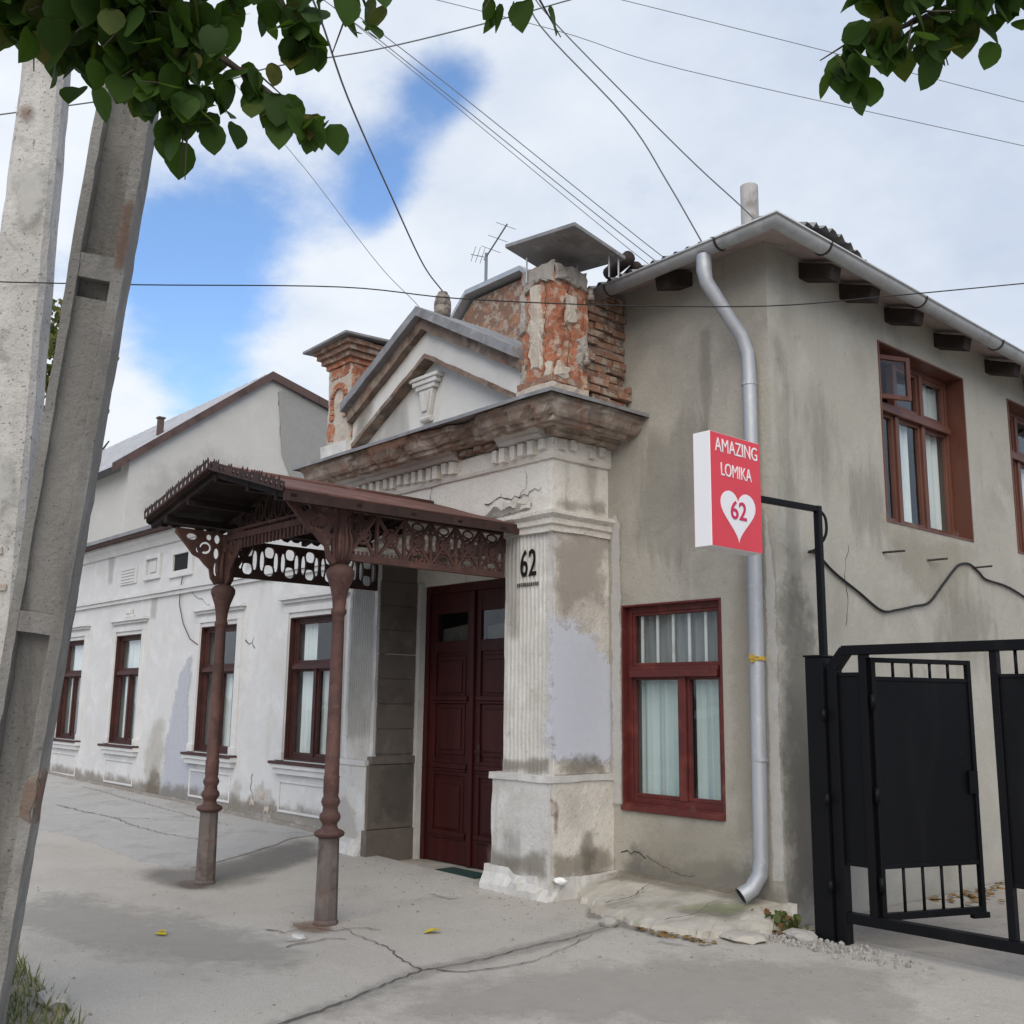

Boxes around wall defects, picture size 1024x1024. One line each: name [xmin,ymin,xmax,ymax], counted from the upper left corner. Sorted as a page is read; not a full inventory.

flaking render [519,259,589,391]
spalling [330,362,368,395]
spalling [327,424,335,442]
crack [485,469,540,505]
crack [605,850,695,903]